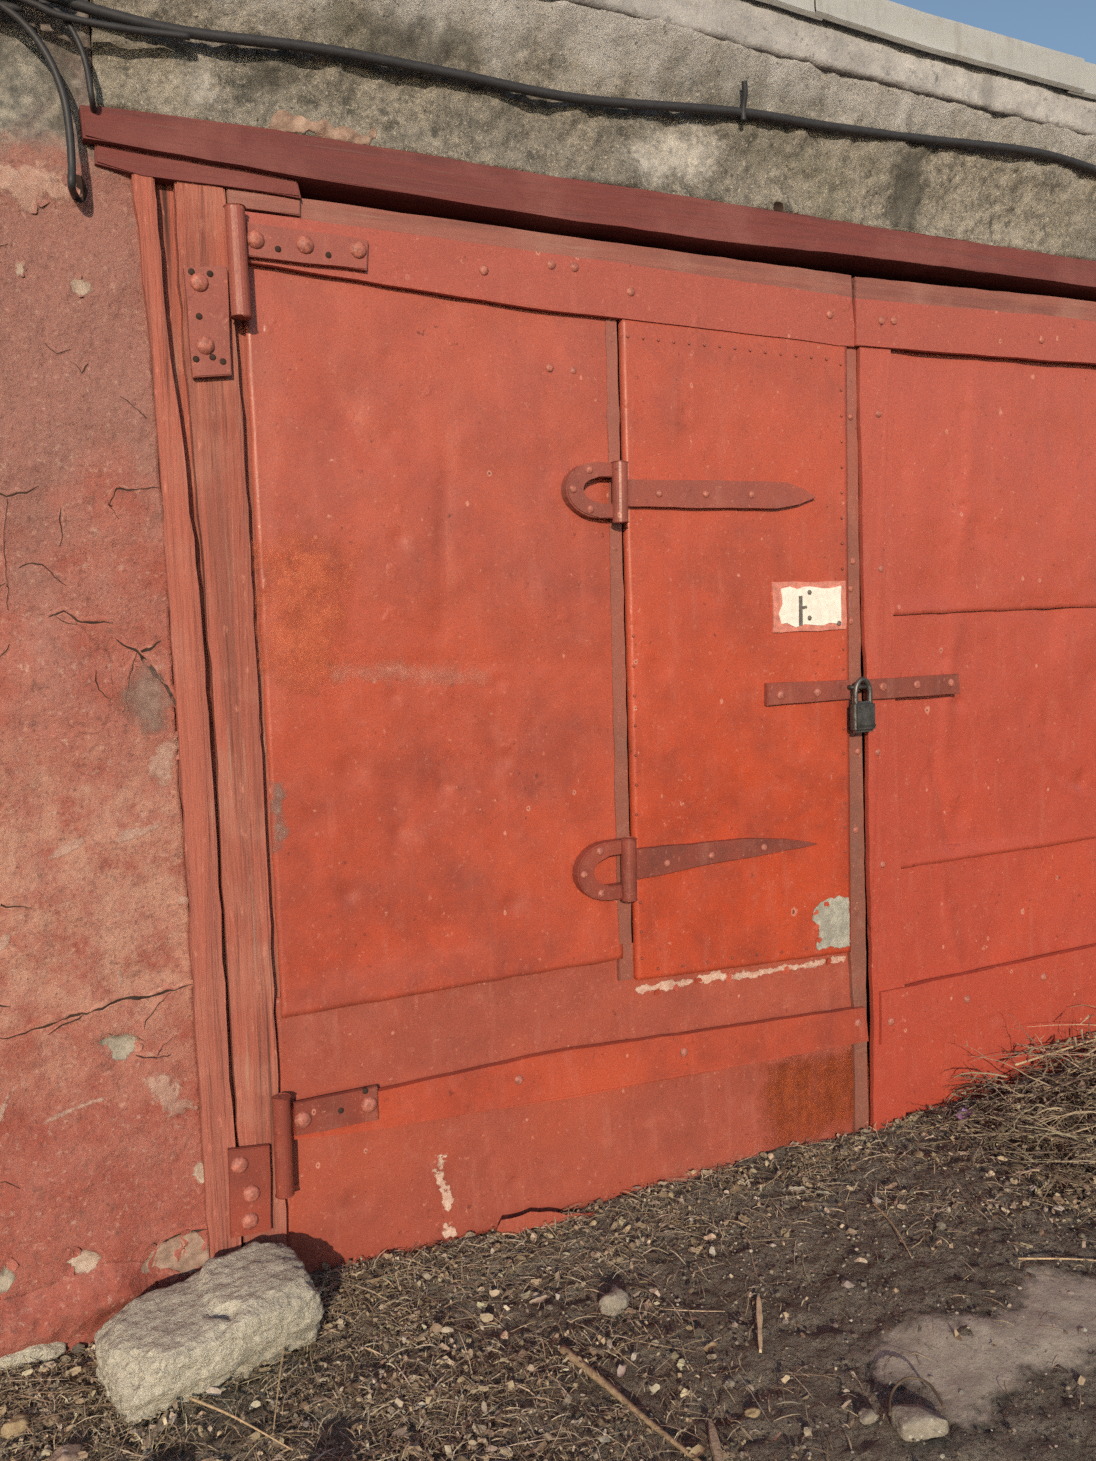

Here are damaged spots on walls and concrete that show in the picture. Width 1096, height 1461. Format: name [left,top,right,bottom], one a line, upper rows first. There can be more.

leakage [625,122,720,181]
peeling [0,161,90,214]
crack [0,484,176,711]
peeling [635,896,851,996]
crack [0,980,193,1061]
flaking render [98,1034,144,1060]
corrosion [765,1056,854,1140]
peeling [432,1154,457,1239]
flaking render [0,1258,19,1316]
flaking render [61,1246,101,1277]
flaking render [141,1230,210,1283]